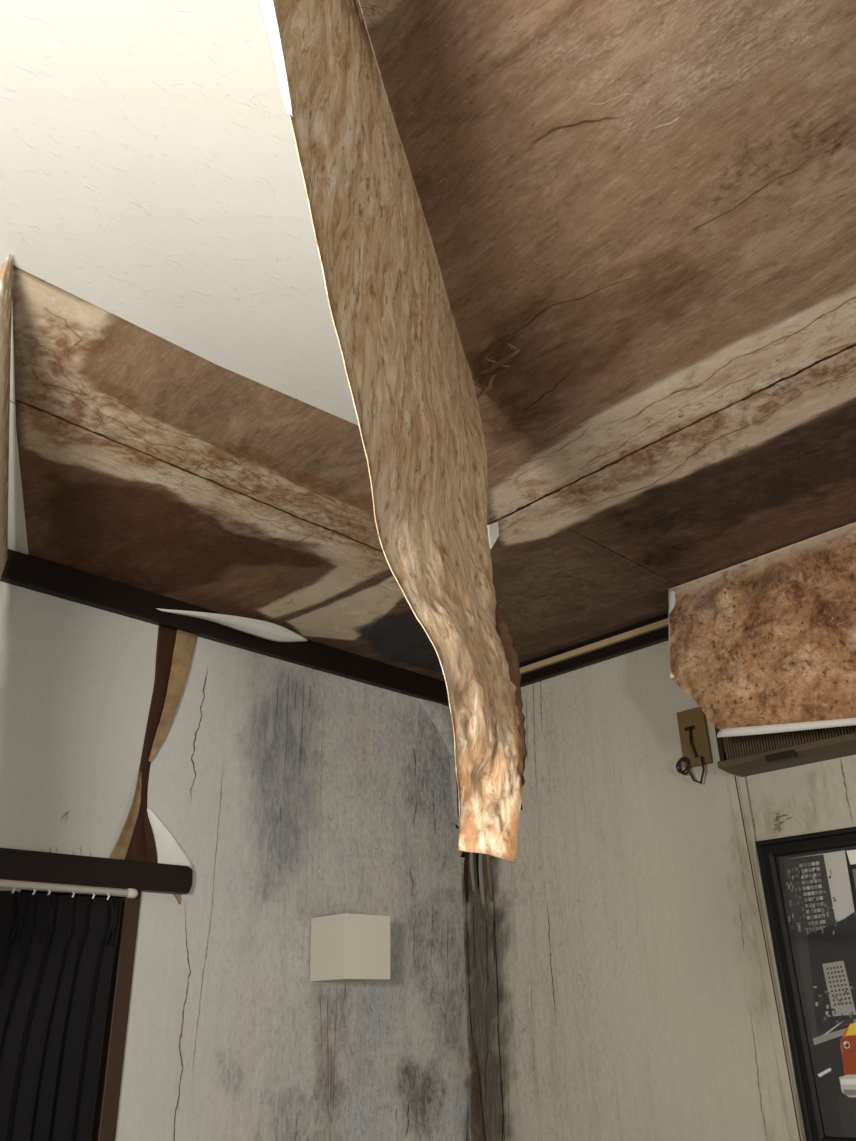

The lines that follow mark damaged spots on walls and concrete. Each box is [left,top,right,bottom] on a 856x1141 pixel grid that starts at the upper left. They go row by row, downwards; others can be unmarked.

crack [10,399,384,553]
damp [615,413,856,531]
crack [173,904,191,1141]
damp [462,853,506,1141]